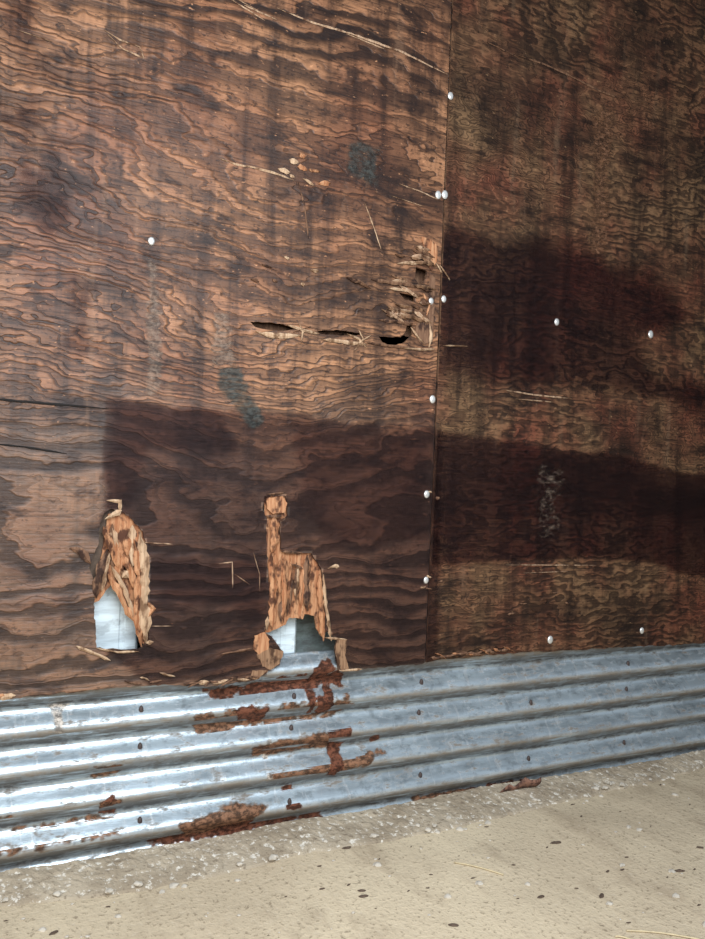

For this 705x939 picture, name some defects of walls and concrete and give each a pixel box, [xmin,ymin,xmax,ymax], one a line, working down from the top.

crack [251,322,466,351]
crack [0,398,108,409]
crack [0,444,67,454]
spalling [70,499,156,661]
hole [220,492,362,680]
corrosion [192,659,353,734]
corrosion [252,726,385,791]
corrosion [148,802,322,845]